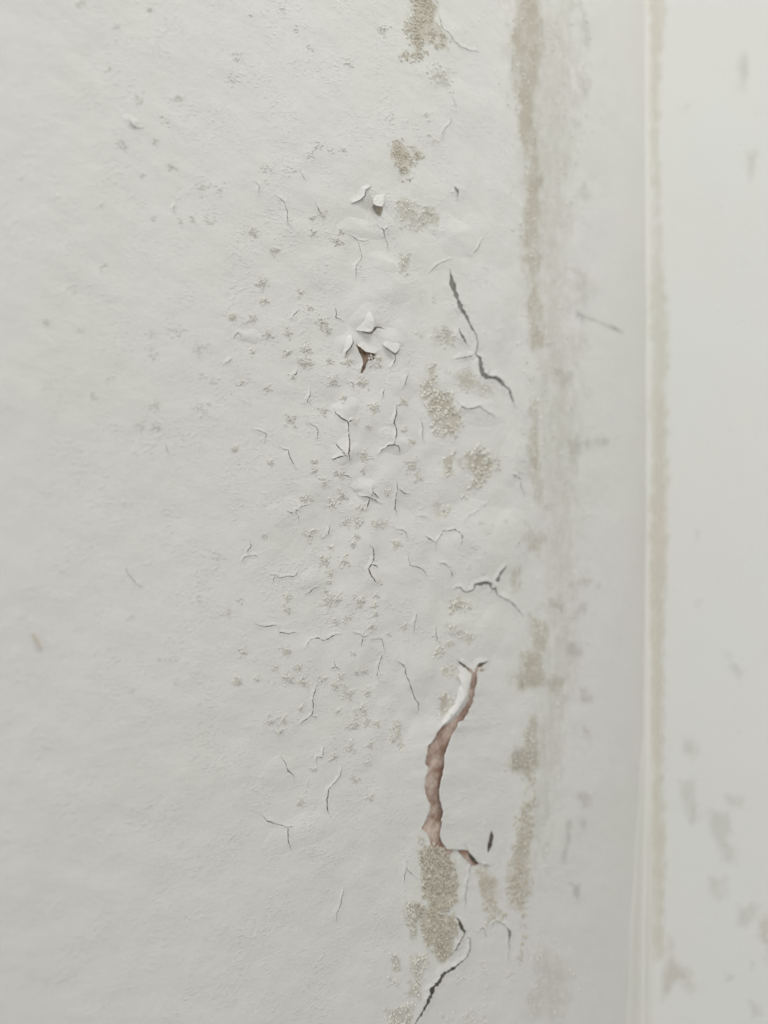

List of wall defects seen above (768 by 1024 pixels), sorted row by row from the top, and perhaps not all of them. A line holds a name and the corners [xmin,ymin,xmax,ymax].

damp [378,0,454,93]
peeling [349,183,385,216]
damp [387,137,425,183]
peeling [343,311,400,374]
crack [428,235,520,422]
peeling [391,657,516,866]
damp [473,611,584,980]
damp [383,835,464,1024]
crack [410,864,514,1024]